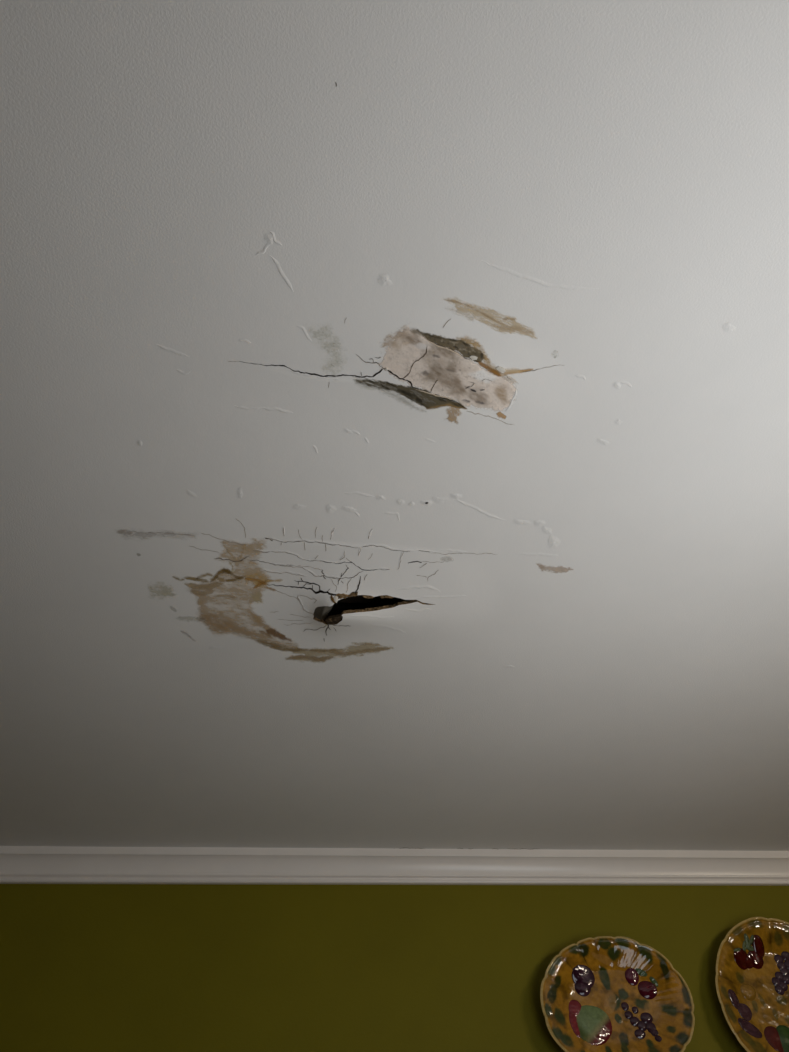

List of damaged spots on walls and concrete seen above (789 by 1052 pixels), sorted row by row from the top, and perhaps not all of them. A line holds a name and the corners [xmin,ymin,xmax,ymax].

crack [229,361,383,388]
spalling [356,329,533,412]
water stain [152,541,390,662]
crack [130,519,495,642]